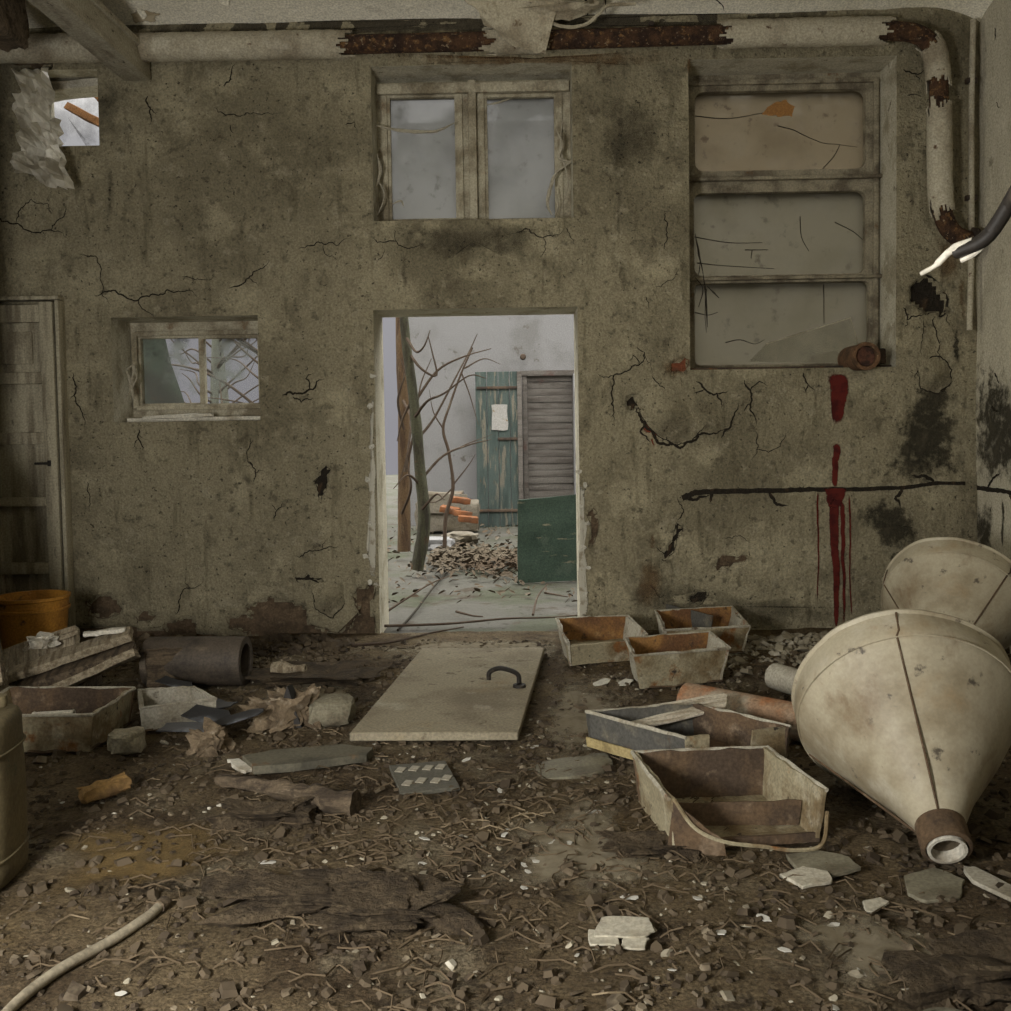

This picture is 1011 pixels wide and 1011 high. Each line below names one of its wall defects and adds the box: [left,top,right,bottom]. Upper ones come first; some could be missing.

crack [0,199,270,317]
flaking render [910,275,950,317]
crack [598,347,788,459]
water stain [976,374,1011,477]
crack [677,474,1011,520]